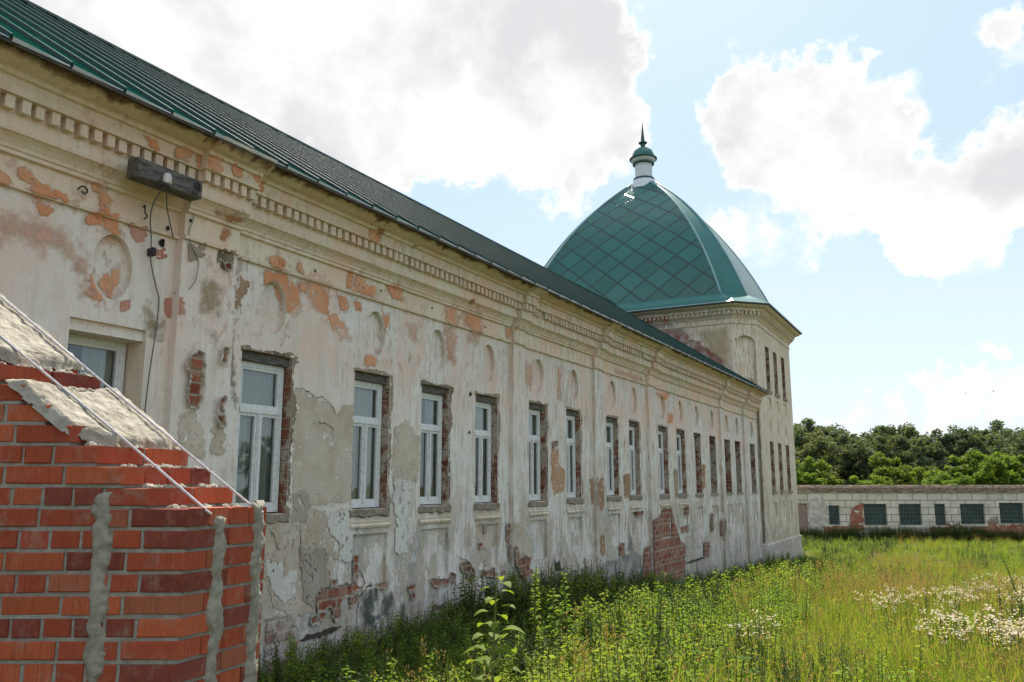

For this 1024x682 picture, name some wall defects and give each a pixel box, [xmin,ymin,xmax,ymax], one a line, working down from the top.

flaking render [0,161,78,217]
flaking render [86,182,170,259]
flaking render [264,256,405,341]
flaking render [178,350,228,459]
flaking render [220,345,389,676]
flaking render [391,418,421,554]
flaking render [635,492,690,583]
flaking render [807,498,865,532]